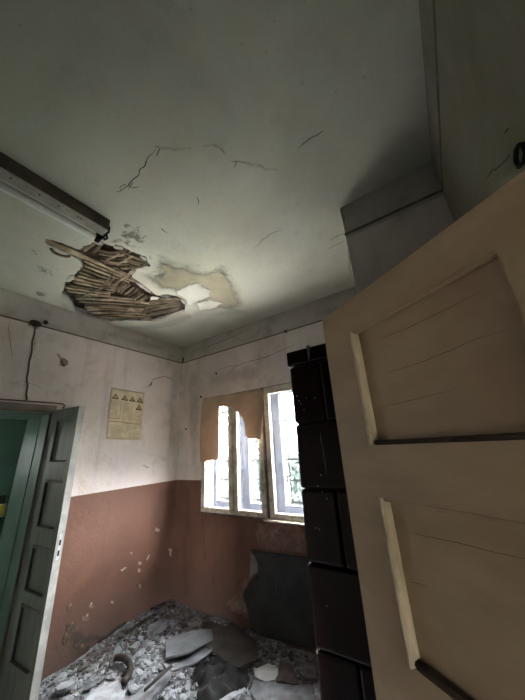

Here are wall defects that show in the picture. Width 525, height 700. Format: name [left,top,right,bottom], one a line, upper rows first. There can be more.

crack [117,144,278,192]
spalling [45,239,222,322]
peeling [226,553,258,618]